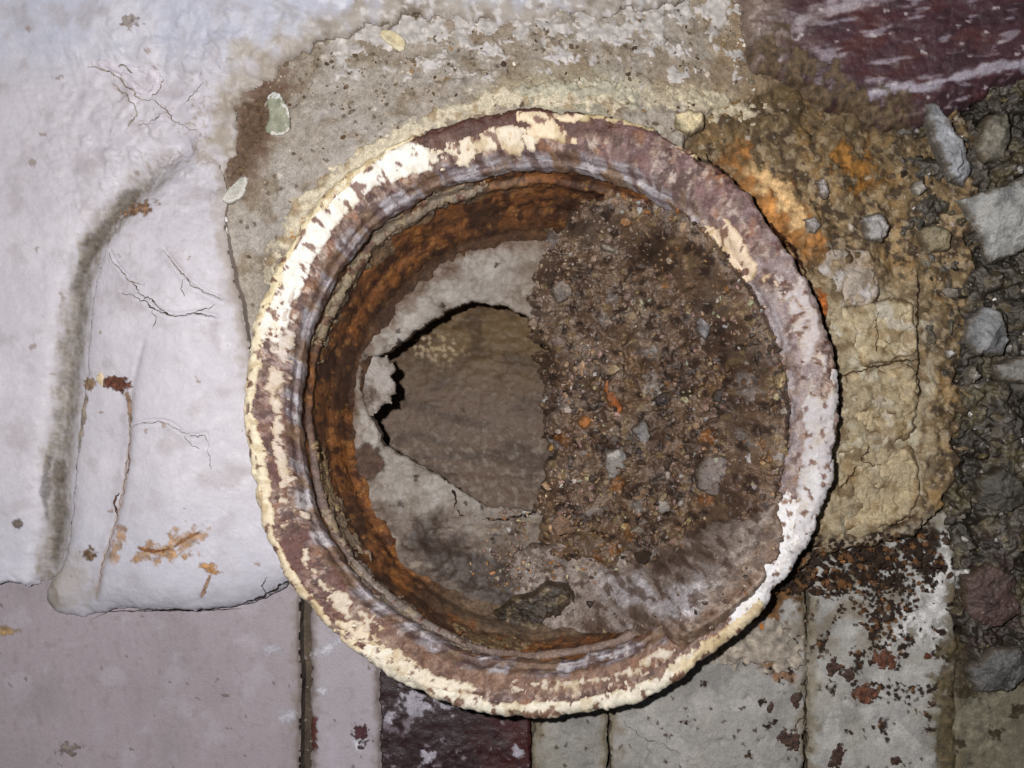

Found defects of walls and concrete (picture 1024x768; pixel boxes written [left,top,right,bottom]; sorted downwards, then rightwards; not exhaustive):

crack [136,83,203,130]
corrosion [829,138,879,195]
corrosion [720,142,826,259]
crack [109,251,222,324]
corrosion [816,288,828,321]
corrosion [78,372,133,445]
peeling [243,111,839,719]
corrosion [355,443,385,481]
crack [93,392,289,619]
corrosion [110,525,127,560]
corrosion [133,528,207,563]
corrosion [200,563,220,596]